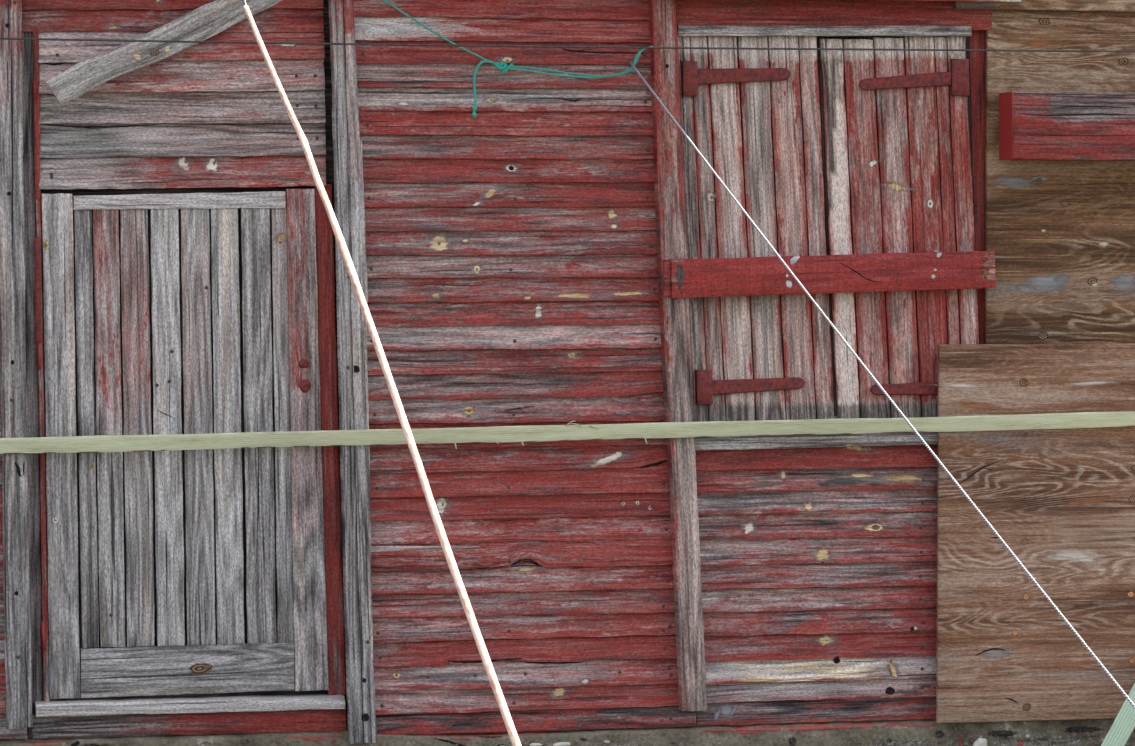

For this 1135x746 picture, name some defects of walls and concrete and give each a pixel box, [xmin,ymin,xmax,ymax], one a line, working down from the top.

peeling [176,156,221,171]
peeling [606,210,619,228]
peeling [424,235,471,254]
peeling [555,291,649,299]
peeling [524,297,544,318]
peeling [586,452,631,467]
crack [640,460,668,468]
peeling [851,473,928,484]
crack [959,460,1002,484]
peeling [741,520,754,536]
peeling [813,546,832,564]
crack [476,559,538,569]